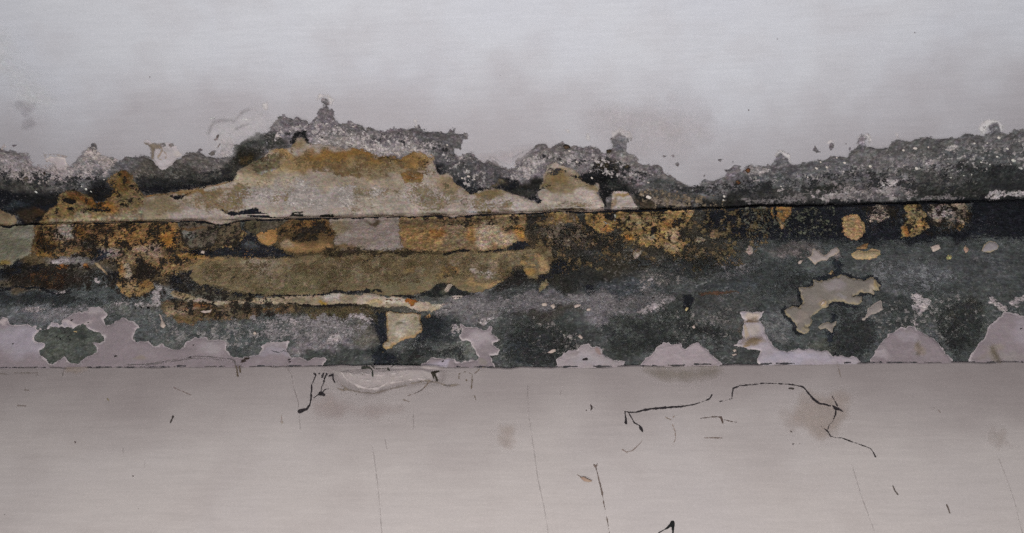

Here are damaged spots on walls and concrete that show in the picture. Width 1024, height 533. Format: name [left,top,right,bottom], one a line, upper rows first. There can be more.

flaking render [0,137,889,350]
water stain [0,94,1024,368]
crack [2,198,1024,228]
flaking render [901,203,971,238]
peeling [0,307,327,369]
peeling [421,324,500,368]
peeling [547,334,625,368]
peeling [641,342,722,367]
peeling [732,311,953,366]
peeling [968,311,1024,363]
crack [0,350,335,423]
crack [403,361,1023,457]